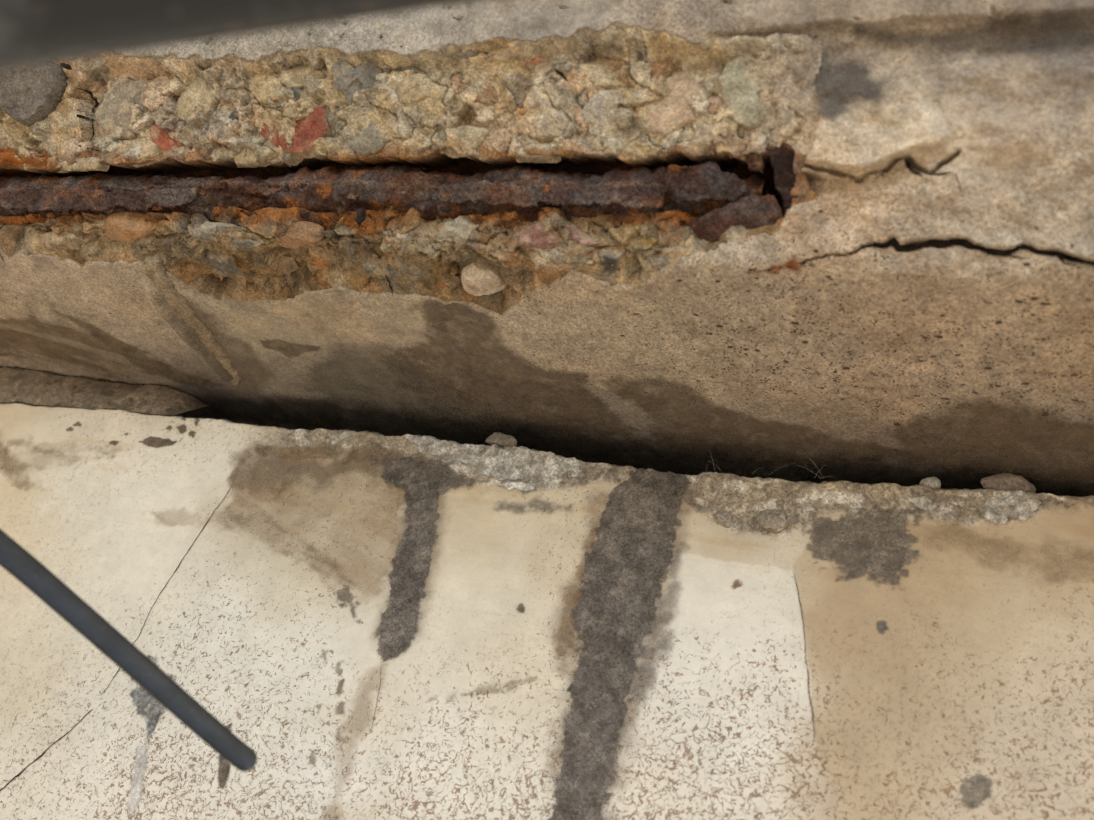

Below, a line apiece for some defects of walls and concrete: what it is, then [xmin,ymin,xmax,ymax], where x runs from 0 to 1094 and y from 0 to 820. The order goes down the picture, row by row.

rust [328,154,428,170]
spalling [0,22,822,315]
crack [904,159,953,176]
rust [339,209,387,234]
crack [807,238,1094,266]
water stain [0,316,217,387]
water stain [204,300,1094,820]